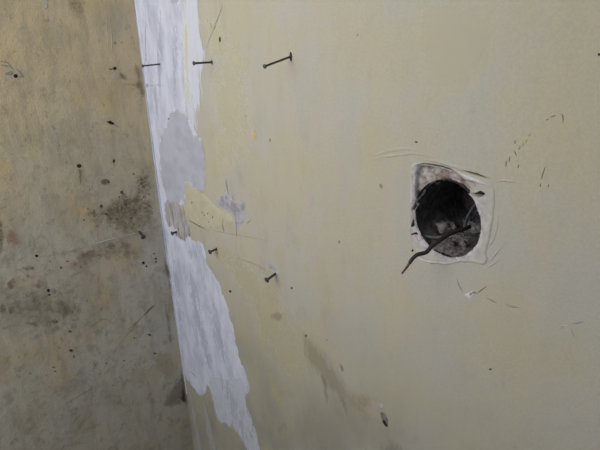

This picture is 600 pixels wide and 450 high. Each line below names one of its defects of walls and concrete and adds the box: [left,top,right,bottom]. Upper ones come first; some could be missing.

water stain [91,173,151,230]
peeling [134,0,260,450]
spalling [372,147,518,268]